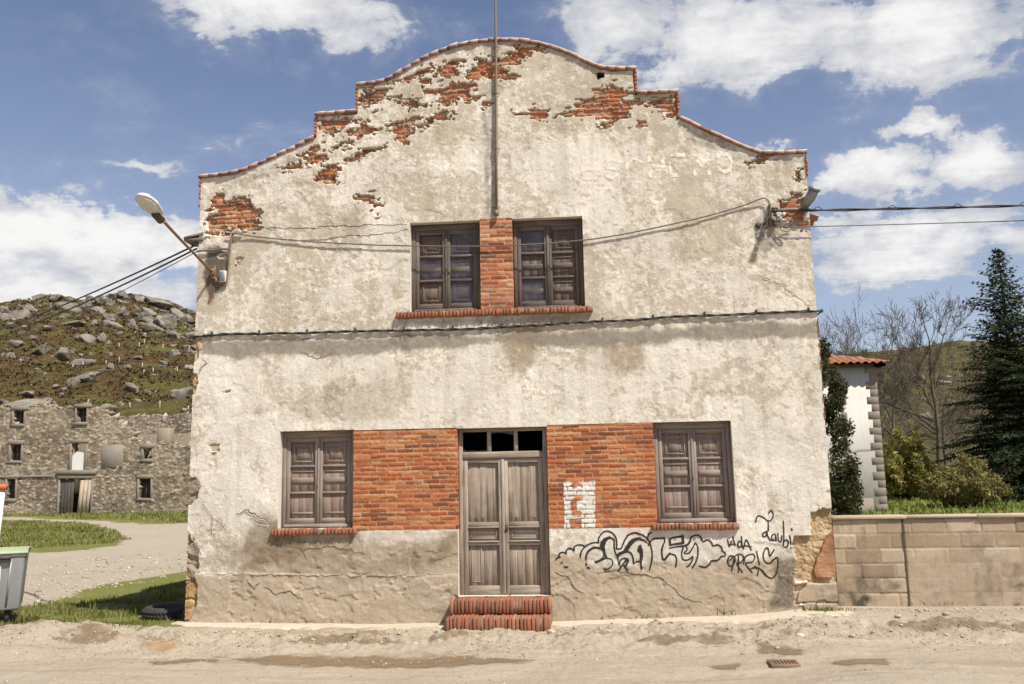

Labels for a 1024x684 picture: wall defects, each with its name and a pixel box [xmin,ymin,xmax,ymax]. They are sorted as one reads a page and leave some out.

spalling [278,44,548,185]
spalling [510,72,677,130]
spalling [203,193,264,239]
spalling [353,191,384,219]
spalling [778,168,809,233]
flaking render [185,535,201,622]
crack [198,504,444,599]
crack [557,570,700,602]
flaking render [790,507,838,606]